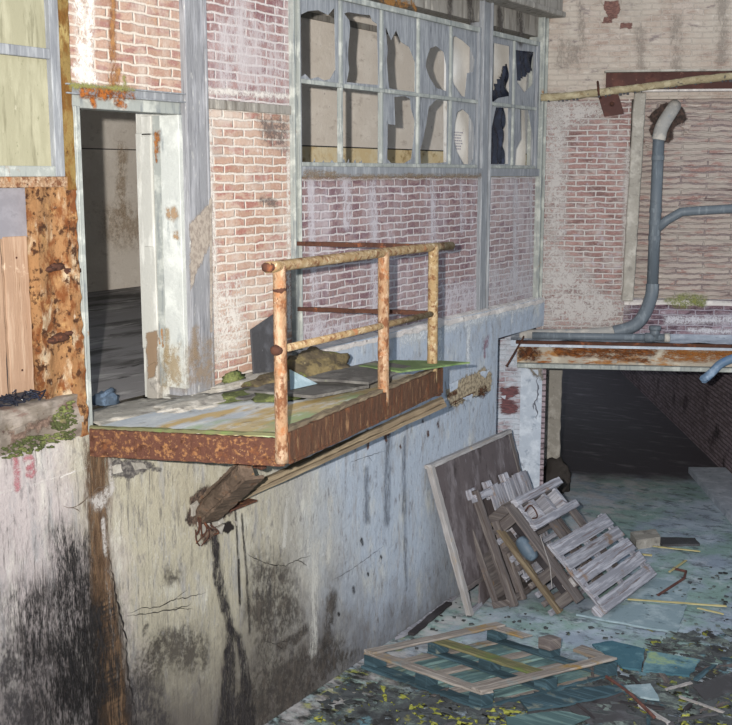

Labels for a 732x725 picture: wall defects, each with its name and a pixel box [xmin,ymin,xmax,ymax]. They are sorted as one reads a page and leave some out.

rust [80,0,135,108]
spalling [600,0,633,29]
spalling [664,107,691,143]
water stain [308,178,316,257]
water stain [438,100,630,369]
spalling [446,367,492,407]
spalling [500,386,519,415]
rust [518,347,540,361]
rust [554,347,732,363]
water stain [0,526,207,725]
crack [108,549,198,724]
water stain [210,490,353,725]